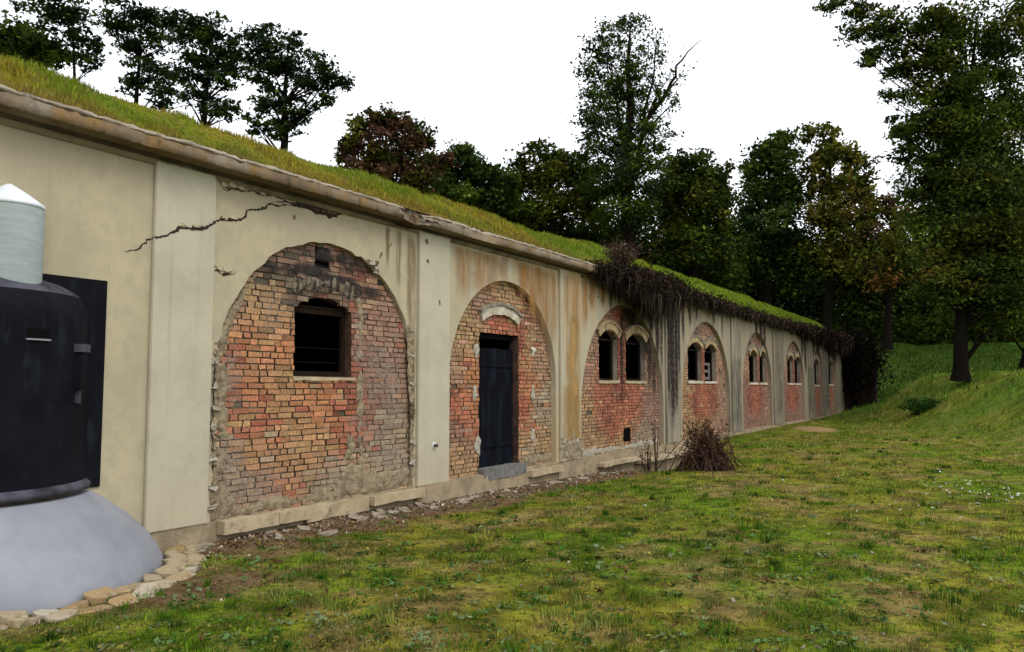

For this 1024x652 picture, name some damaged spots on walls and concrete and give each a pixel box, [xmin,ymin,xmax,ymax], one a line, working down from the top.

crack [125,177,297,252]
spalling [367,242,392,275]
peeling [208,274,416,520]
water stain [602,286,698,408]